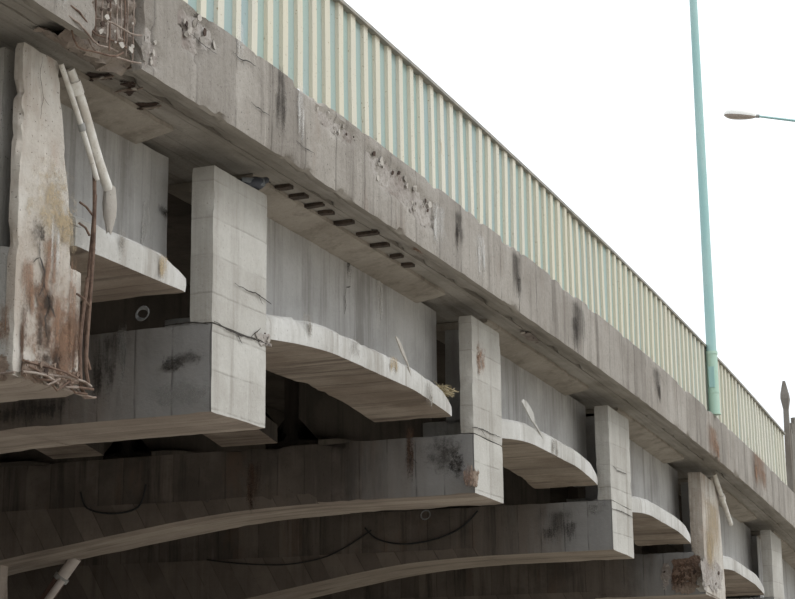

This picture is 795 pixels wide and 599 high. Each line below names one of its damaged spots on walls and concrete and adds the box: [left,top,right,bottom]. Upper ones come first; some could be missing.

spalling [33,0,162,110]
spalling [177,8,216,54]
spalling [366,151,435,229]
spalling [0,174,97,399]
rust [20,175,80,373]
crack [165,321,269,345]
spalling [660,554,723,594]